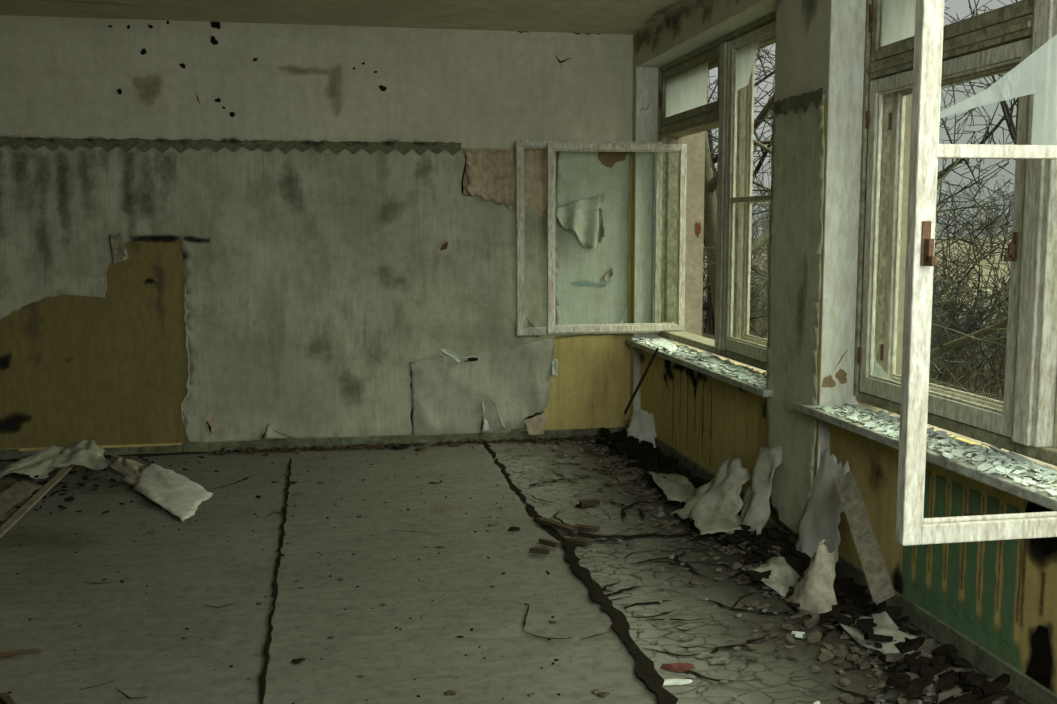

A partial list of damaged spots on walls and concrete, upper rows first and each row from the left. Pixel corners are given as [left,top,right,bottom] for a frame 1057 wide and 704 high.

peeling [598,152,627,168]
peeling [461,148,606,253]
leakage [131,235,210,310]
peeling [0,233,190,449]
crack [103,449,247,457]
leakage [923,470,1053,518]
crack [449,438,840,704]
leakage [893,537,1057,692]
crack [831,654,939,704]